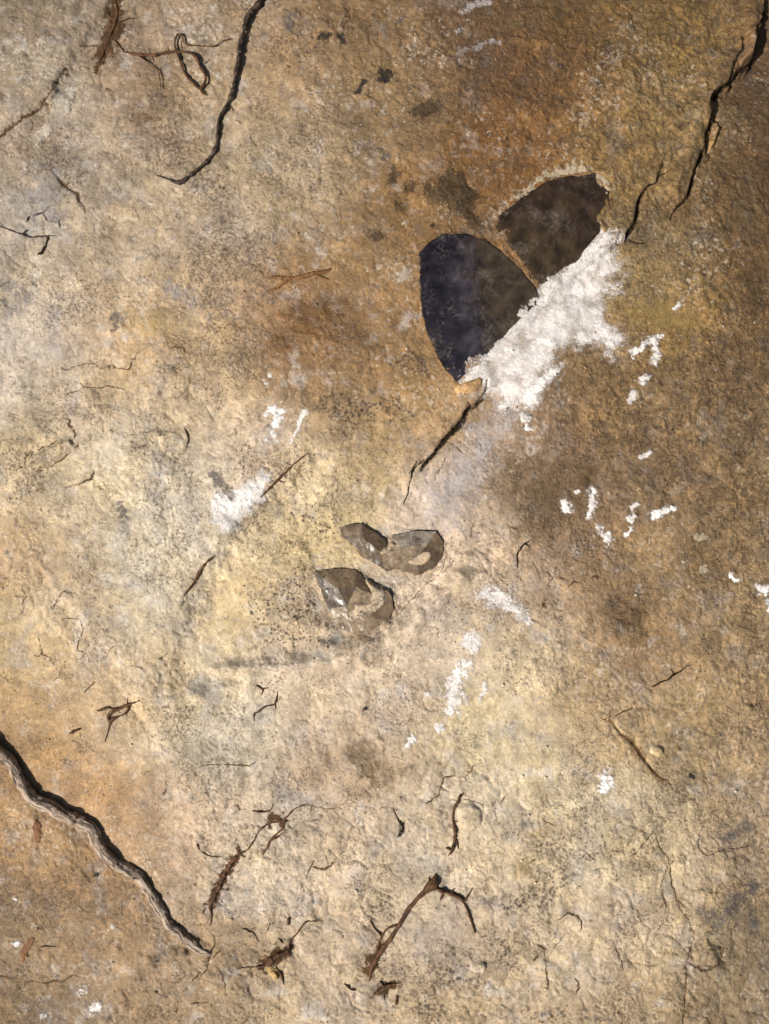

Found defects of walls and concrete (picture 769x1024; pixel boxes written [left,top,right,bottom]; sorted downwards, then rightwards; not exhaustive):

crack [583,2,767,273]
water stain [458,230,664,431]
crack [403,386,489,504]
crack [206,760,257,773]